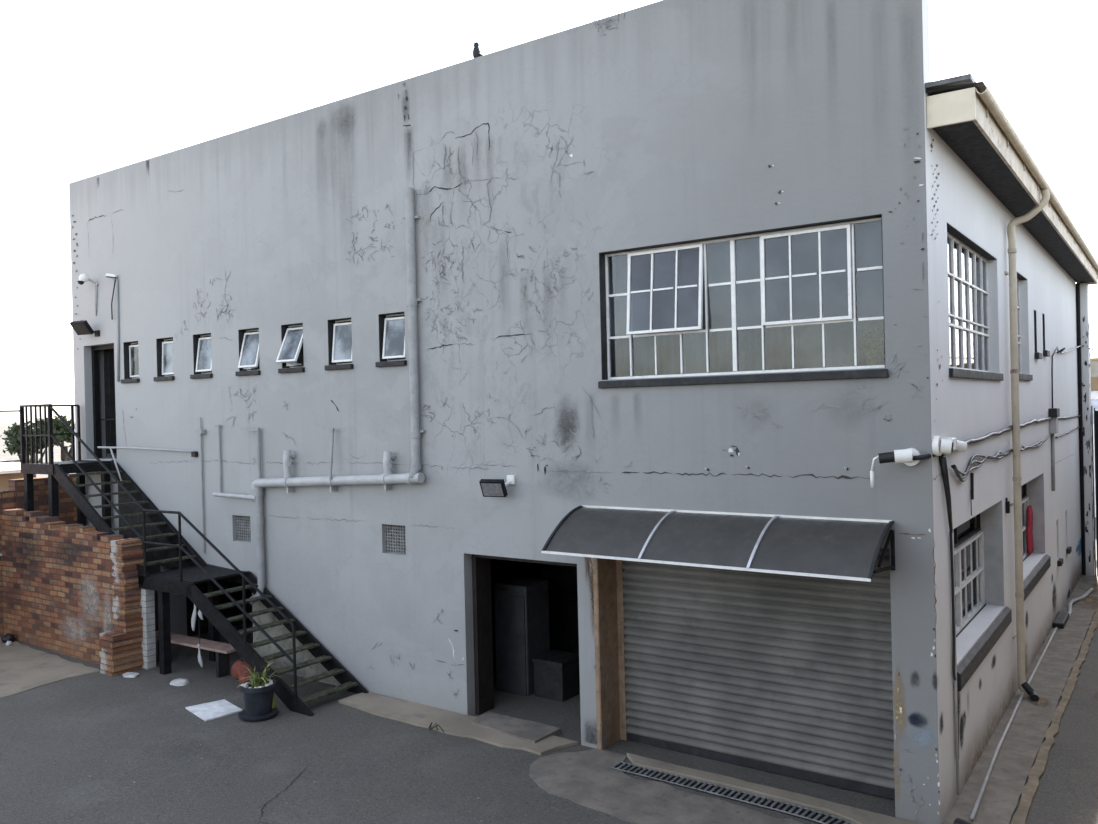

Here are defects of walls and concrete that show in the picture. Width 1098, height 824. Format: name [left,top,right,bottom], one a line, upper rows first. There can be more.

crack [412,123,515,283]
crack [427,331,546,361]
crack [553,470,877,479]